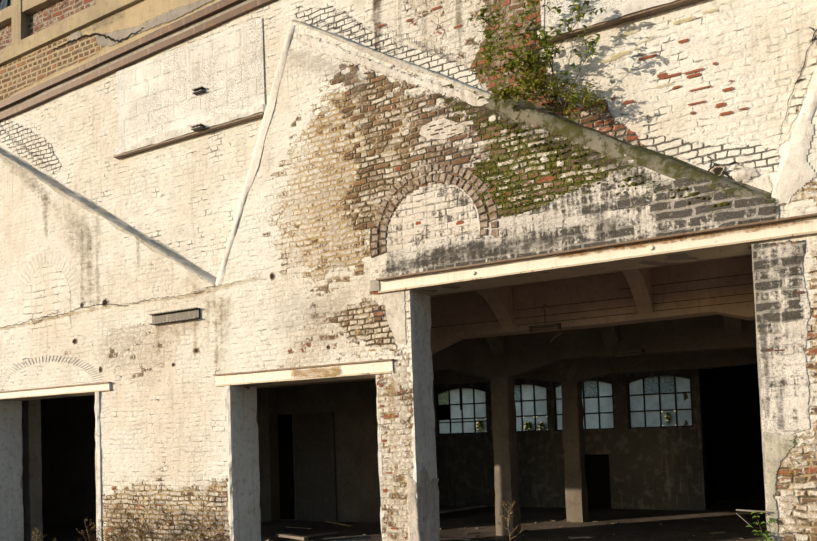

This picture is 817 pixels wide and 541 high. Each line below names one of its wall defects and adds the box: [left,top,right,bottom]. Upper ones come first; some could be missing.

crack [53,27,144,50]
peeling [403,0,646,148]
peeling [657,68,712,92]
peeling [264,56,515,296]
water stain [633,170,779,234]
peeling [780,180,817,210]
water stain [393,232,580,271]
crack [1,276,256,328]
water stain [753,240,806,375]
peeling [329,298,440,541]
peeling [763,251,817,541]
peeling [101,478,233,541]